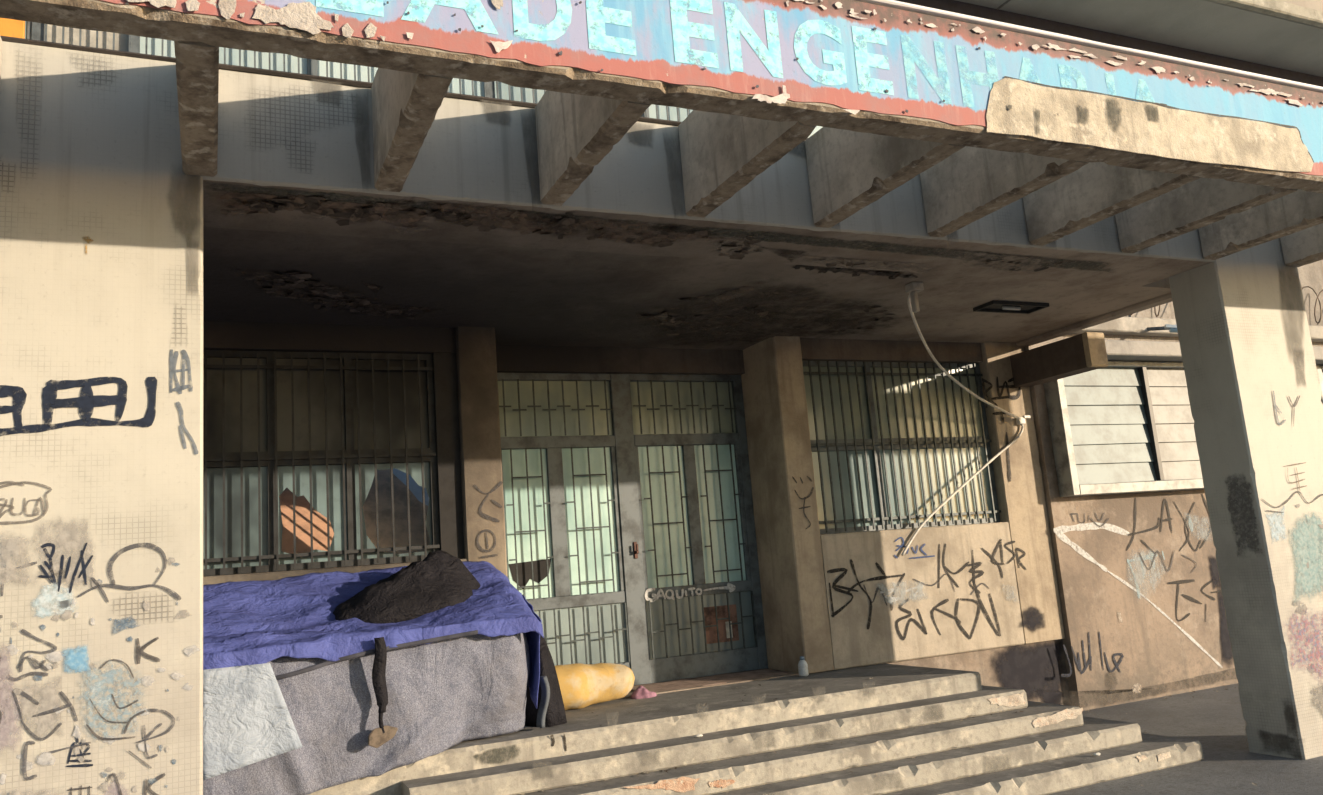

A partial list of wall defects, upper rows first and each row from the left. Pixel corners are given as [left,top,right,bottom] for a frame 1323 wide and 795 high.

peeling [127,0,200,11]
peeling [218,0,385,41]
peeling [481,25,518,53]
peeling [786,0,887,30]
peeling [907,18,1323,107]
peeling [752,85,790,104]
spalling [986,78,1314,172]
damp [509,116,1108,271]
damp [178,175,485,289]
spalling [216,192,923,279]
spalling [624,776,735,792]